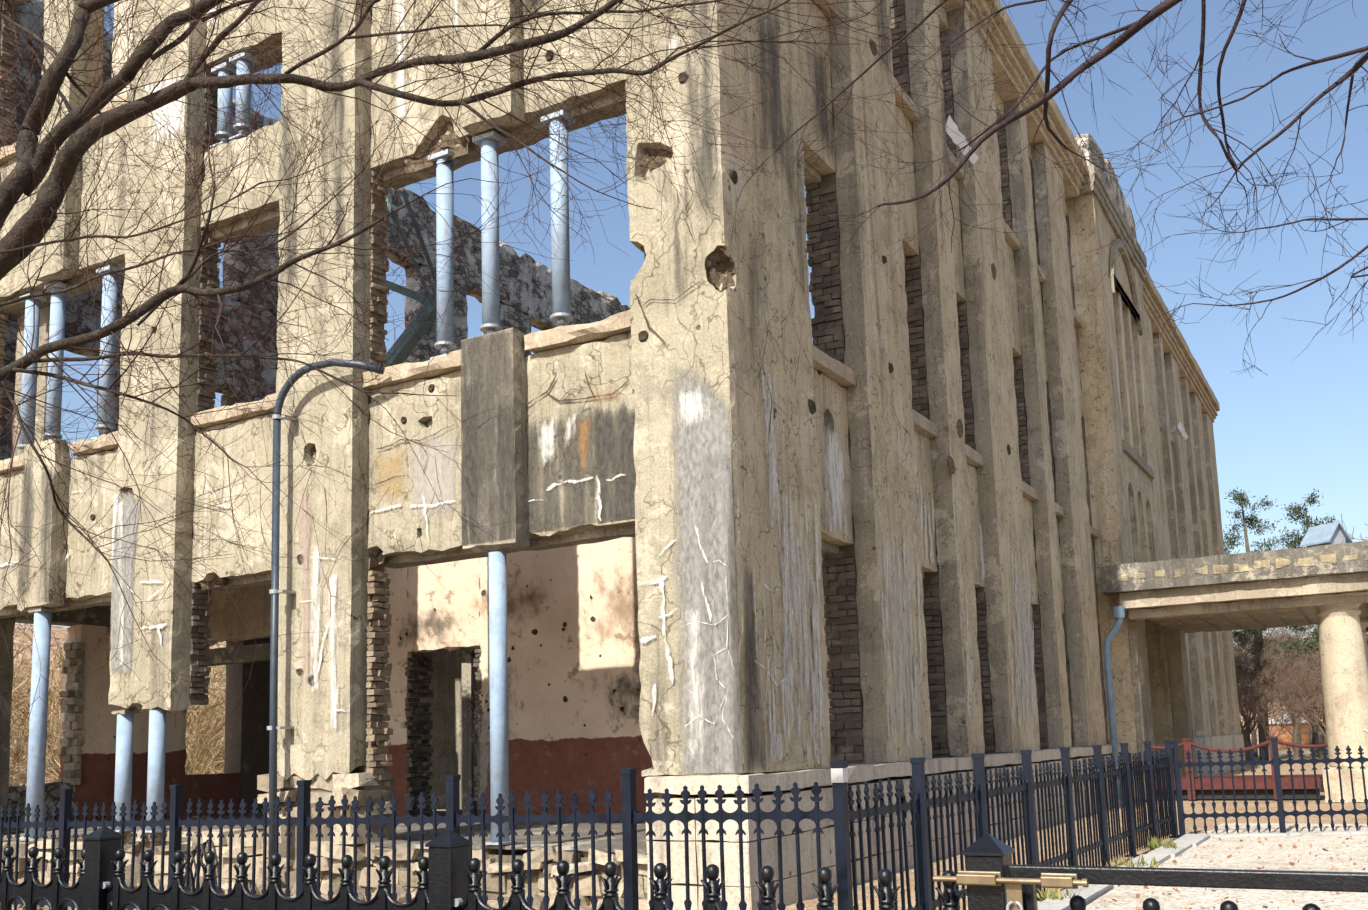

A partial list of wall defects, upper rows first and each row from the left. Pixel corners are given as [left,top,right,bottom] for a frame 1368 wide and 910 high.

spalling [640,148,672,181]
spalling [706,247,736,291]
crack [525,373,629,406]
leakage [680,393,703,422]
leakage [461,331,636,545]
crack [530,474,624,521]
crack [300,424,454,673]
crack [640,527,790,739]
leakage [690,613,702,754]